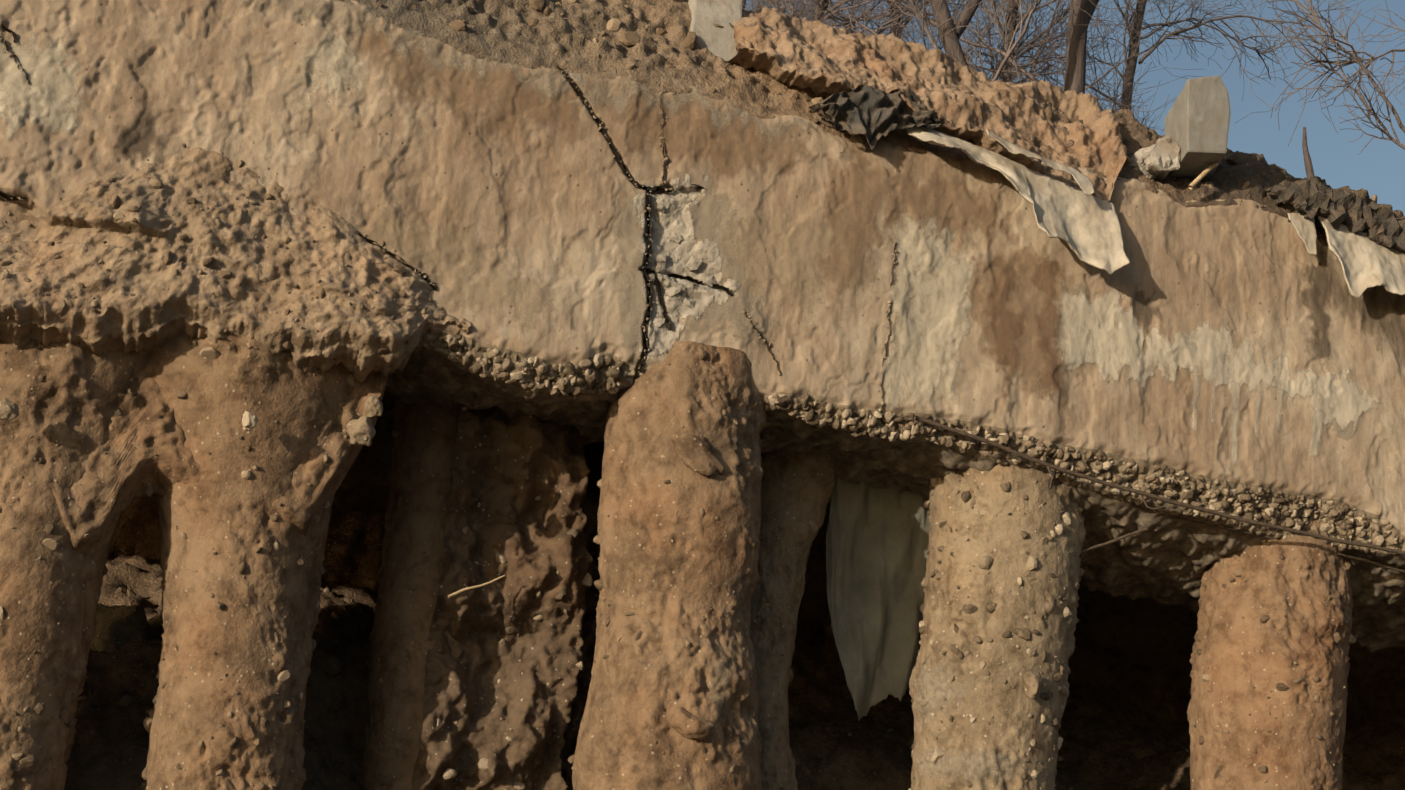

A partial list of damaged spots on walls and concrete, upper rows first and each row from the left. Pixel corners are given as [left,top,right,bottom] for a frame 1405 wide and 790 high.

crack [0,24,31,89]
crack [0,191,27,201]
crack [358,233,437,291]
spalling [415,329,626,399]
leakage [613,173,654,366]
crack [557,65,781,376]
spalling [632,173,740,360]
leakage [676,170,875,348]
crack [878,242,898,412]
flaking render [907,123,1130,275]
leakage [881,216,1405,463]
flaking render [1287,213,1405,298]